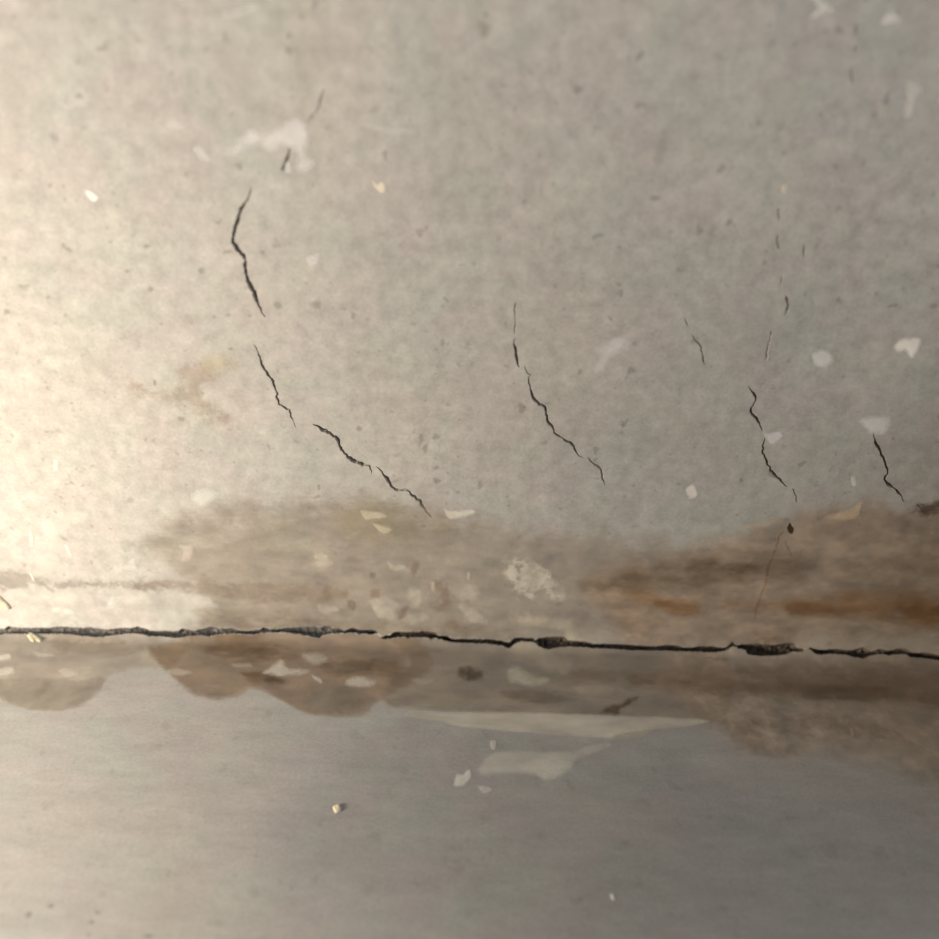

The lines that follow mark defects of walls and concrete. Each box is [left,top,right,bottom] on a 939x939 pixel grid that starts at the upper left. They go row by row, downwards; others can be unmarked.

crack [281,147,290,171]
crack [306,89,324,122]
crack [231,186,265,317]
crack [253,344,432,518]
crack [513,302,605,485]
crack [748,386,797,502]
crack [873,432,928,517]
leakage [587,502,939,647]
crack [0,626,939,661]